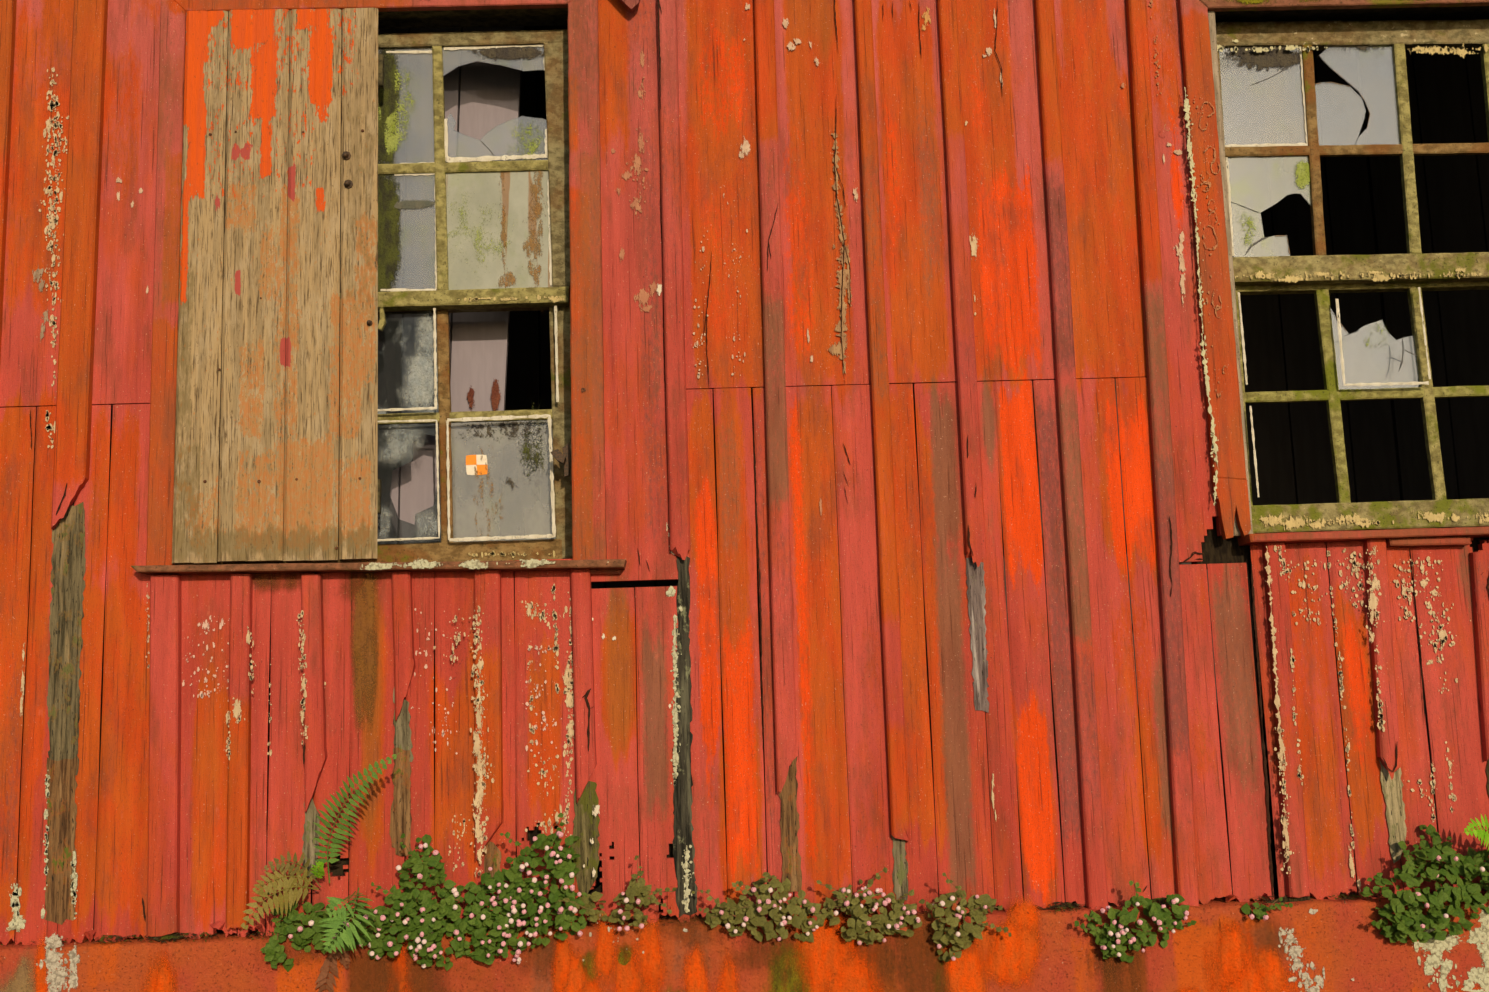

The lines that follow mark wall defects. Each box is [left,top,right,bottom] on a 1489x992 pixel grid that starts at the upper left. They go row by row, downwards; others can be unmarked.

peeling [32,67,69,386]
crack [834,94,851,380]
peeling [1163,87,1219,506]
peeling [45,410,55,449]
peeling [1413,510,1489,524]
peeling [182,615,273,769]
peeling [296,610,326,745]
peeling [411,606,494,877]
peeling [521,583,575,836]
peeling [1260,513,1458,891]
leakage [583,952,596,977]
leakage [618,947,631,965]